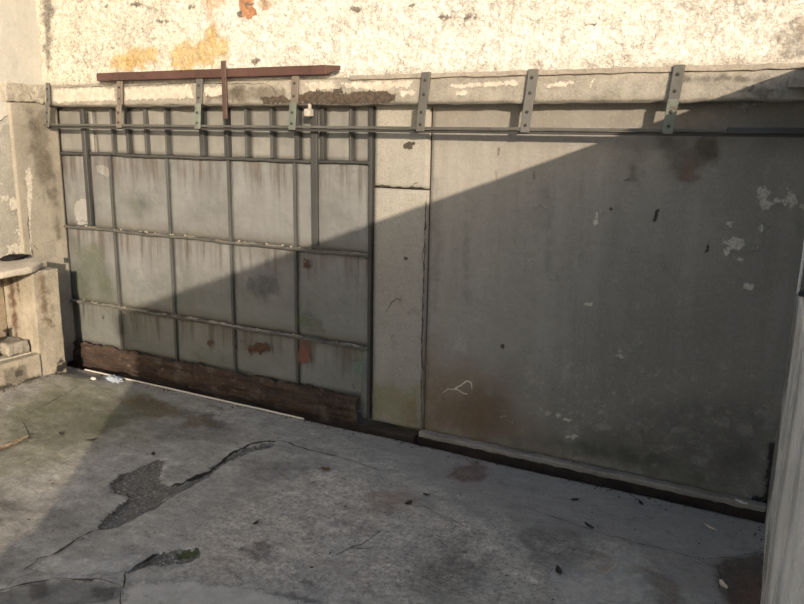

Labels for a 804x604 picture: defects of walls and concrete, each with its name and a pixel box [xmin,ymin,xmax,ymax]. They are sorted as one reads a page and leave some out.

leakage [42,0,53,60]
leakage [172,26,227,70]
peeling [756,179,804,211]
peeling [721,217,746,262]
rust [235,340,270,356]
spalling [97,442,275,530]
crack [146,440,396,512]
crack [337,529,383,555]
crack [0,530,158,604]